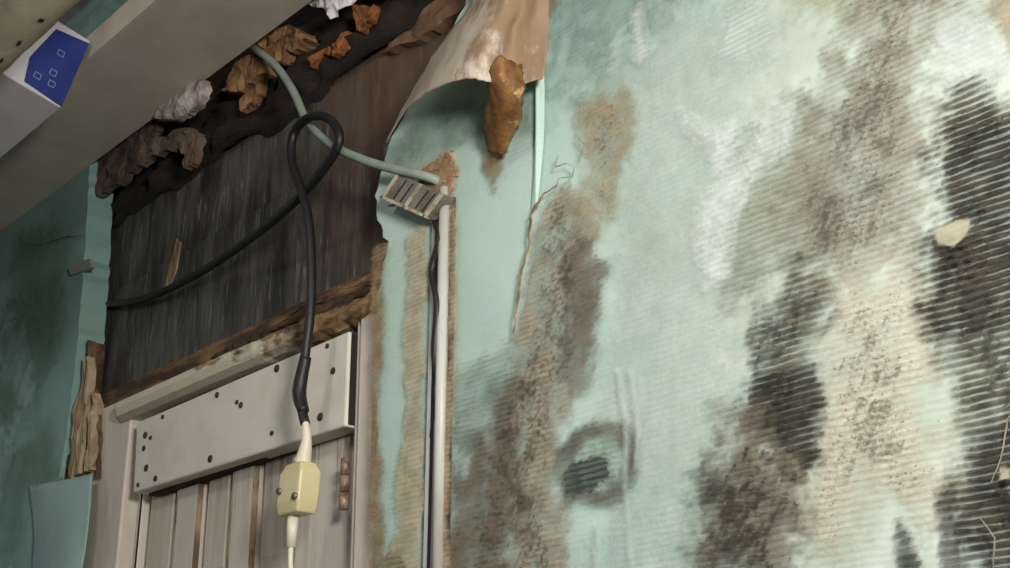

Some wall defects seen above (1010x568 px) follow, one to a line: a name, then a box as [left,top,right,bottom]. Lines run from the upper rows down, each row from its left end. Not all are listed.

spalling [95,79,213,199]
crack [555,137,584,188]
leakage [440,0,1010,568]